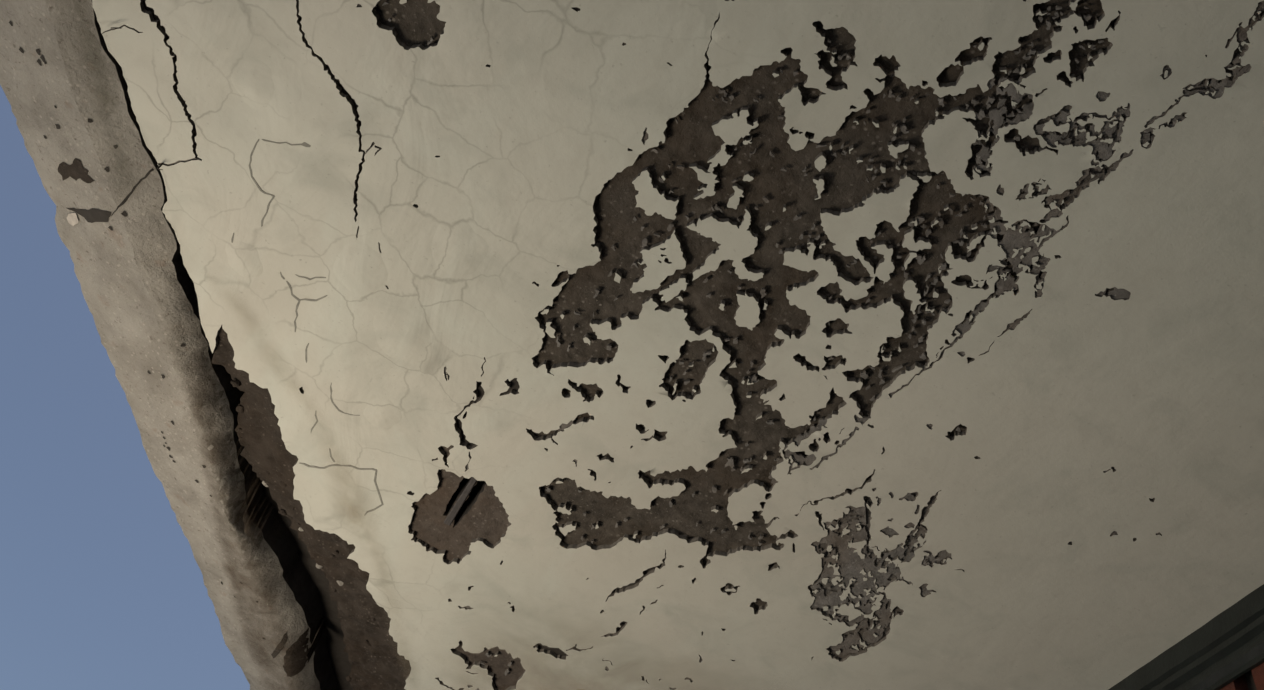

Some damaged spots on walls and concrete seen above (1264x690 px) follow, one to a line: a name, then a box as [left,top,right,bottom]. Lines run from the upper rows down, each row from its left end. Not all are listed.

spalling [357,0,446,47]
crack [231,139,311,243]
crack [326,64,382,252]
spalling [531,0,1264,565]
spalling [212,326,411,690]
spalling [410,445,510,560]
peeling [809,488,952,659]
spalling [455,641,525,690]